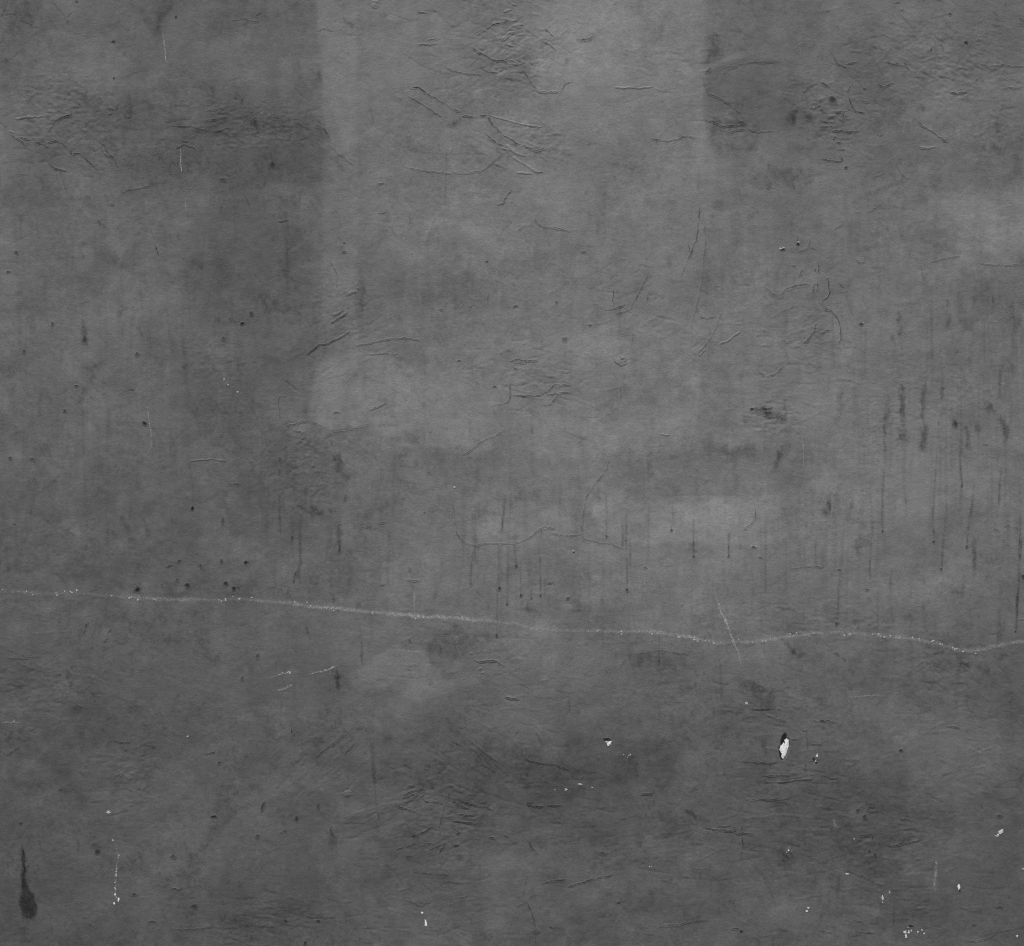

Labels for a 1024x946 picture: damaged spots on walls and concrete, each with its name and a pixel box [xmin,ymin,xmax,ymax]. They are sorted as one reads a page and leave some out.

spalling [779,734,789,760]